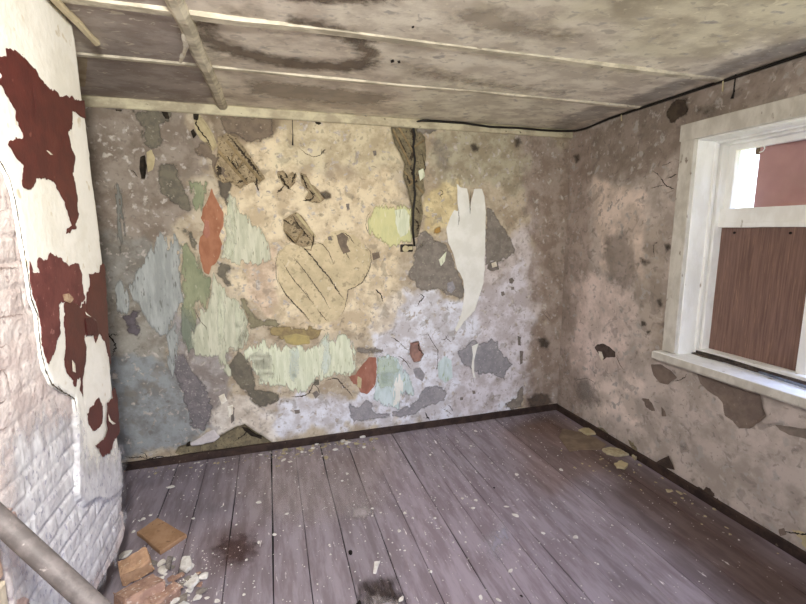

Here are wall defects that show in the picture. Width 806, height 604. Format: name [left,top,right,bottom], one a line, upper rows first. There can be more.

water stain [199,18,377,71]
peeling [77,57,88,87]
spalling [667,99,688,123]
peeling [0,48,86,234]
peeling [368,127,515,332]
peeling [29,110,447,457]
spalling [458,336,523,378]
spalling [595,344,621,366]
spalling [651,364,677,385]
spalling [505,387,523,410]
spalling [697,374,766,429]
spalling [776,425,806,439]